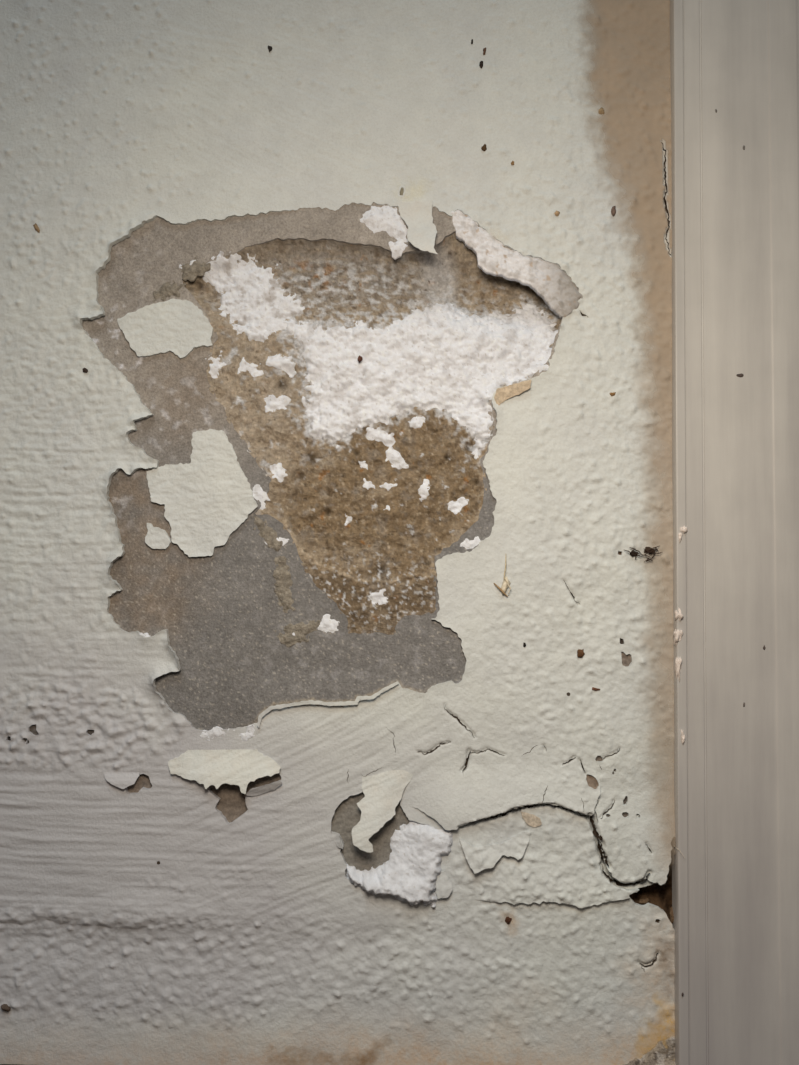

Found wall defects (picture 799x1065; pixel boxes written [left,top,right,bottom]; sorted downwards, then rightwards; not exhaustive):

damp [586,0,673,509]
flaking render [82,189,583,823]
crack [347,709,620,782]
peeling [586,774,598,789]
peeling [331,770,542,908]
crack [469,786,651,886]
flaking render [629,841,674,924]
spalling [624,1036,676,1065]